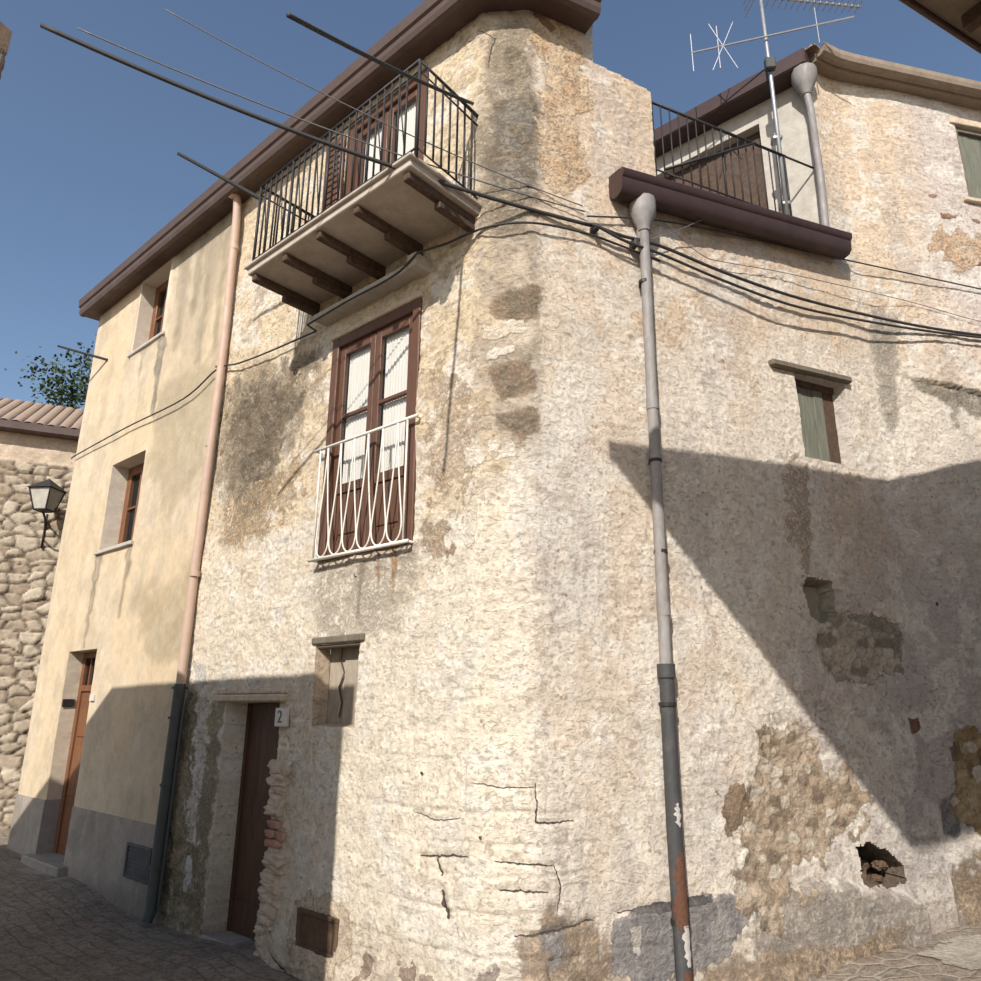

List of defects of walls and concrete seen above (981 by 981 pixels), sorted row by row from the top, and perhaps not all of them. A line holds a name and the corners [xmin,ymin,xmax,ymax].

flaking render [927,212,981,276]
water stain [211,347,323,550]
spalling [817,610,904,685]
crack [471,782,574,824]
spalling [949,725,981,836]
spalling [687,712,875,976]
flaking render [286,890,375,981]
flaking render [397,961,434,981]
crack [420,853,469,919]
crack [494,861,592,937]
flaking render [610,901,676,981]
rust [672,852,693,981]